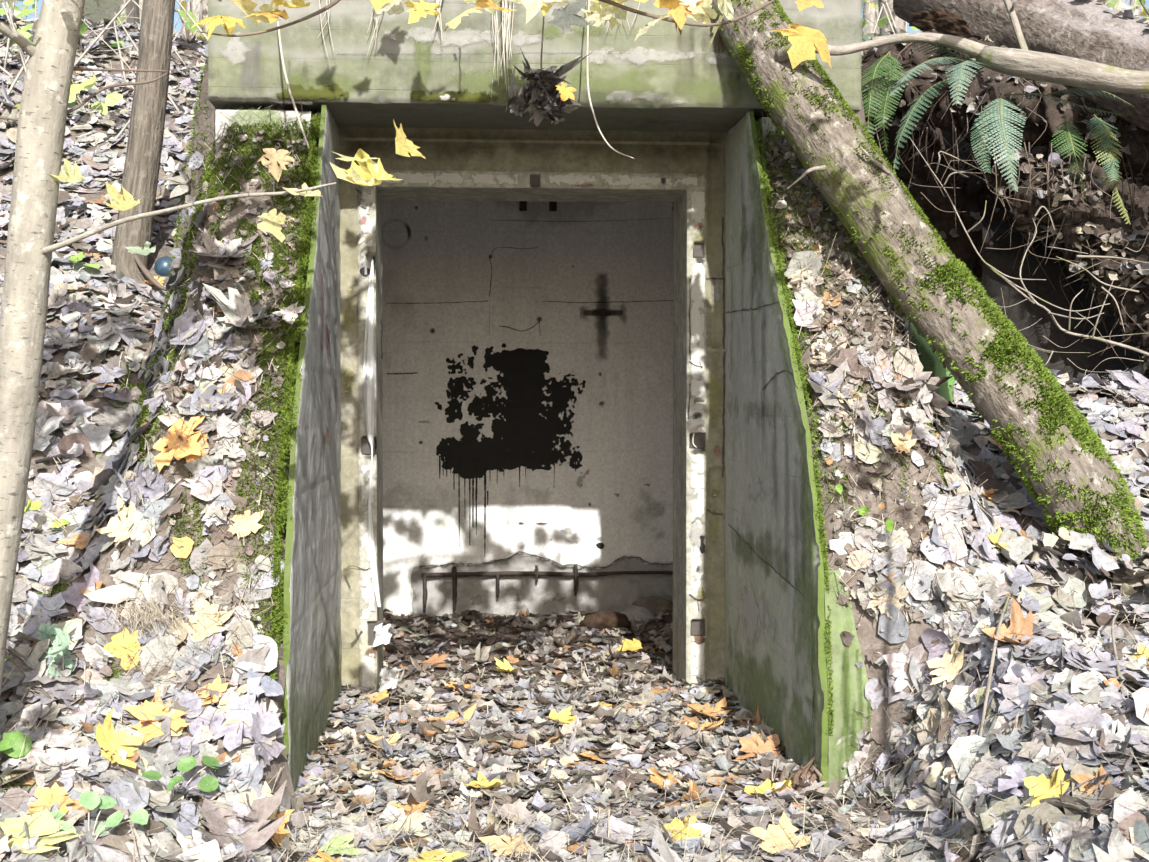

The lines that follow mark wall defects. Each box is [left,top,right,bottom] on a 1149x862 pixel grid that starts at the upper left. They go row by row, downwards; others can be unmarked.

water stain [386,28,497,92]
water stain [513,32,541,45]
water stain [586,47,693,64]
water stain [607,91,661,100]
peeling [691,263,705,430]
peeling [689,454,706,591]
spalling [411,551,673,617]
peeling [690,639,705,675]